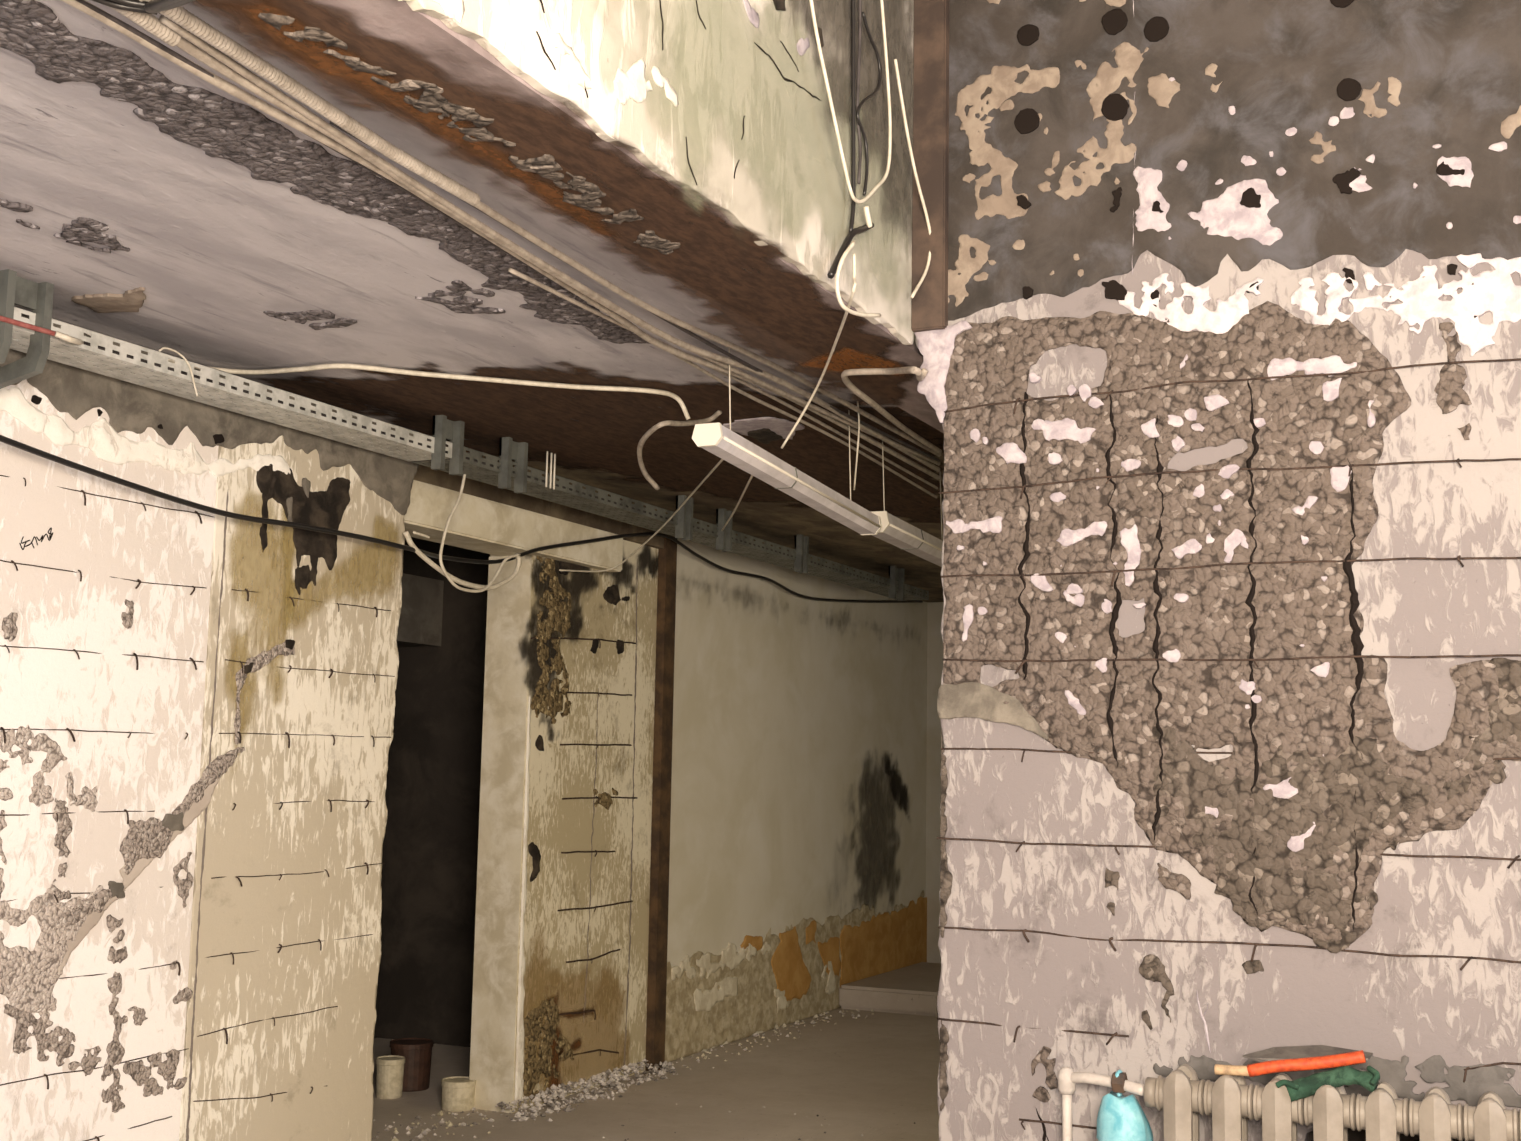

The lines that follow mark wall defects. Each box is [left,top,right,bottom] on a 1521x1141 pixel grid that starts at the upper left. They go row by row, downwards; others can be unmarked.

spalling [0,0,651,344]
rust [192,0,944,523]
peeling [955,42,1180,232]
spalling [0,639,295,1113]
flaking render [12,359,419,595]
water stain [227,494,397,733]
water stain [884,755,909,812]
crack [1018,392,1031,680]
spalling [665,234,1521,1062]
crack [1105,395,1164,840]
crack [1245,381,1259,794]
crack [1343,459,1364,930]